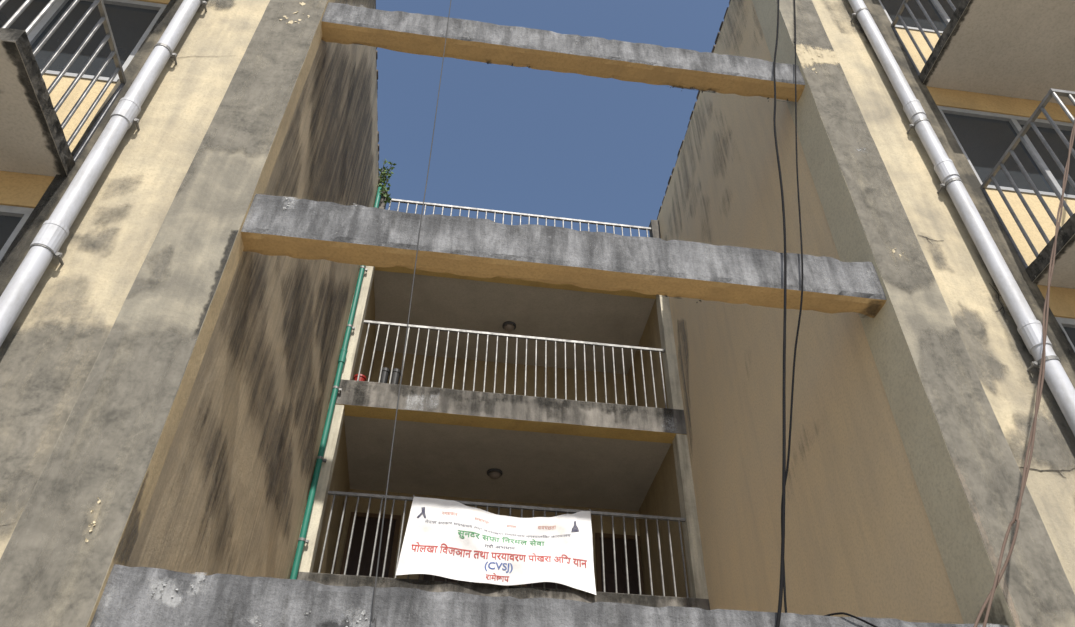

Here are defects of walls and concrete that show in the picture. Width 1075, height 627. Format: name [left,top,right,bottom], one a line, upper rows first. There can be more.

damp [152,0,182,32]
damp [178,0,327,191]
damp [275,49,373,207]
damp [793,0,944,292]
damp [923,0,973,85]
peeling [85,497,101,542]
damp [0,230,238,627]
peeling [151,572,206,607]
damp [229,259,349,533]
spalling [317,610,369,627]
damp [921,303,1075,627]
crack [1020,467,1074,478]